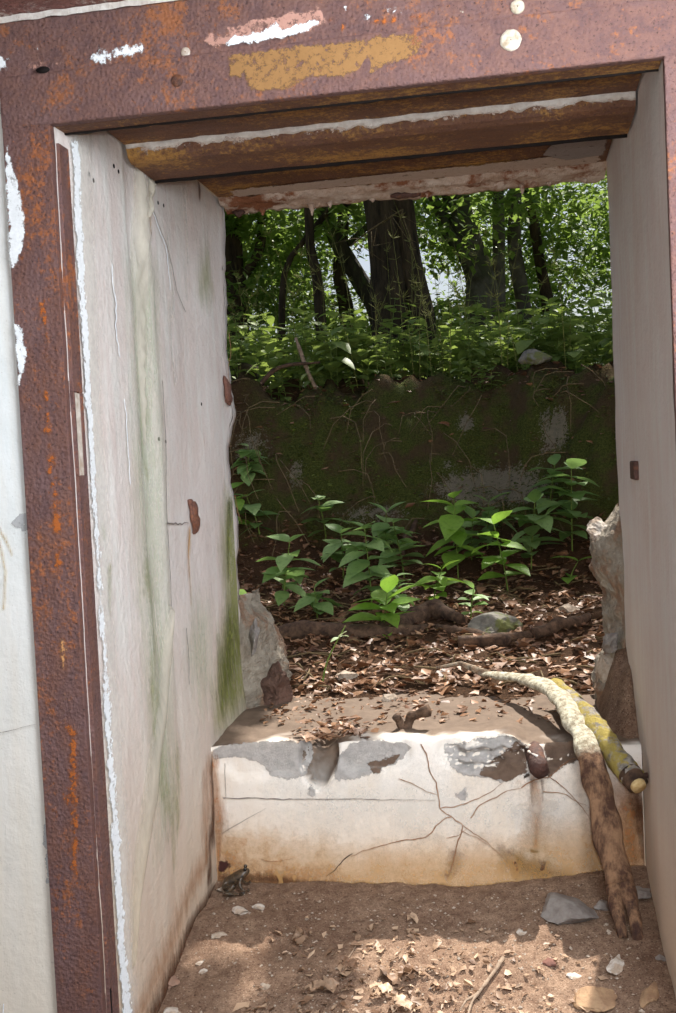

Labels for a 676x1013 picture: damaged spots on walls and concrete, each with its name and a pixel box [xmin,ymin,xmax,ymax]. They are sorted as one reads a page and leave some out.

peeling [204,6,422,91]
corrosion [47,444,61,533]
corrosion [63,719,79,884]
spalling [334,739,410,781]
crack [221,744,590,879]
spalling [444,735,527,800]